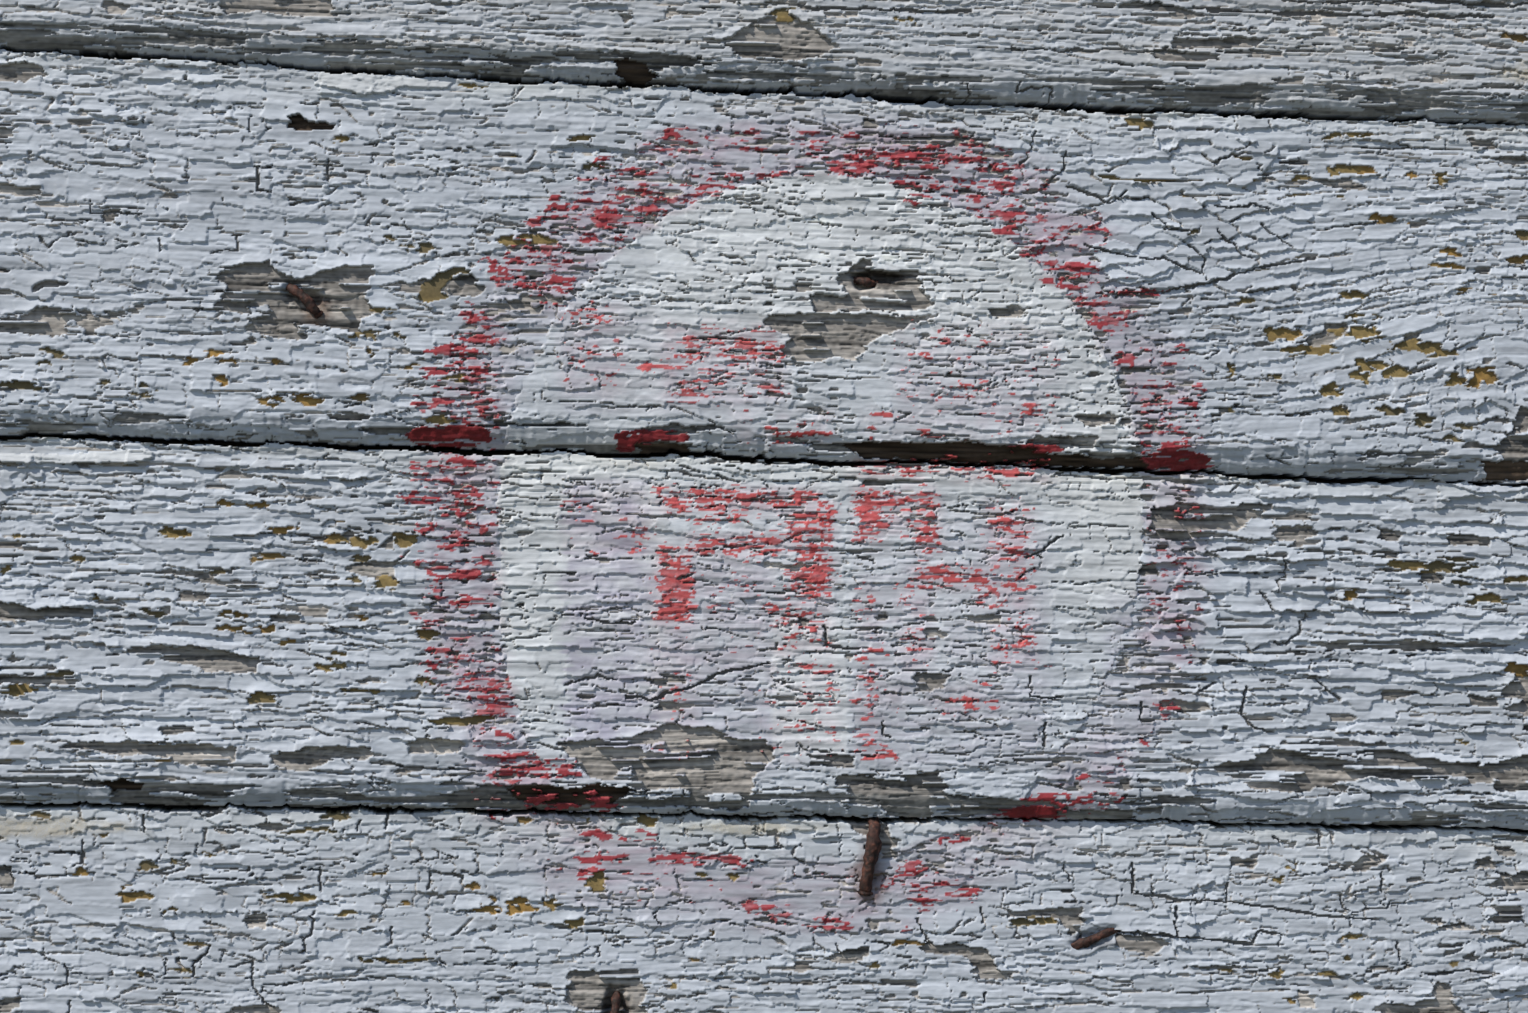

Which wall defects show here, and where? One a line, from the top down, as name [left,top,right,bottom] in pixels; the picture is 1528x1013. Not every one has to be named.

crack [1005,46,1318,299]
peeling [213,261,390,357]
peeling [764,259,933,366]
peeling [0,644,260,717]
peeling [1315,558,1528,730]
peeling [508,724,774,826]
peeling [1214,739,1528,804]
crack [299,867,322,954]
crack [1118,862,1401,960]
crack [55,964,72,1013]
crack [163,945,210,978]
crack [249,961,272,1008]